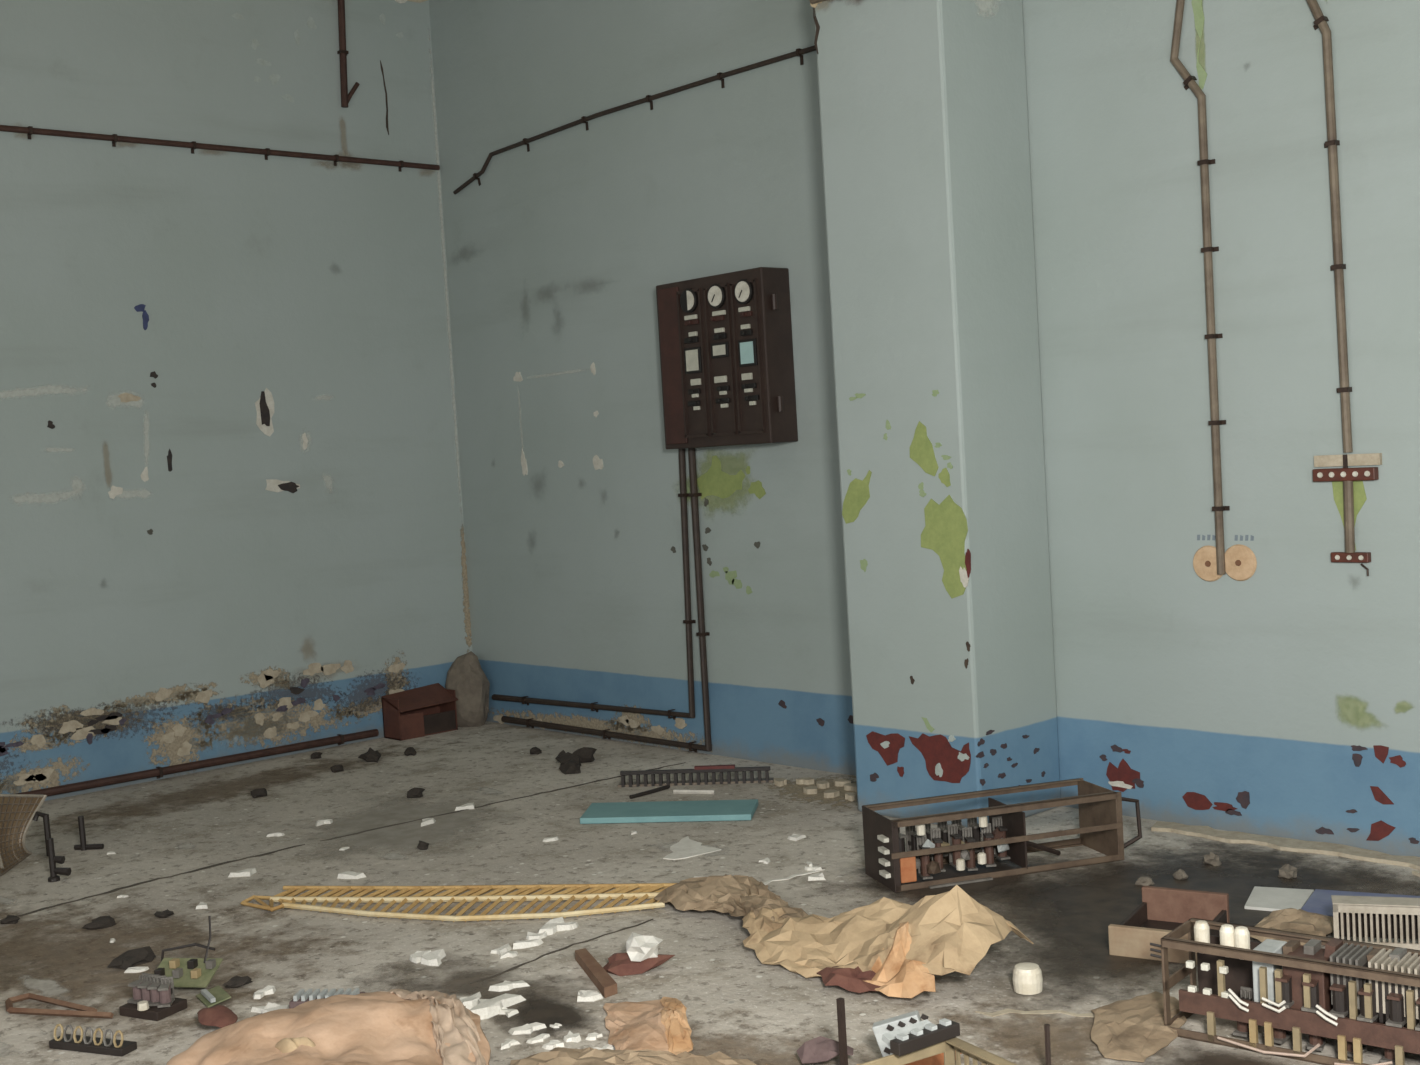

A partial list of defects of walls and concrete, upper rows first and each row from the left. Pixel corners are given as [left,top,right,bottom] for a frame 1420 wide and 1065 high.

crack [810,1,823,54]
peeling [0,653,409,794]
peeling [769,717,1045,809]
peeling [1100,745,1144,792]
peeling [1351,745,1406,768]
flaking render [1151,786,1420,896]